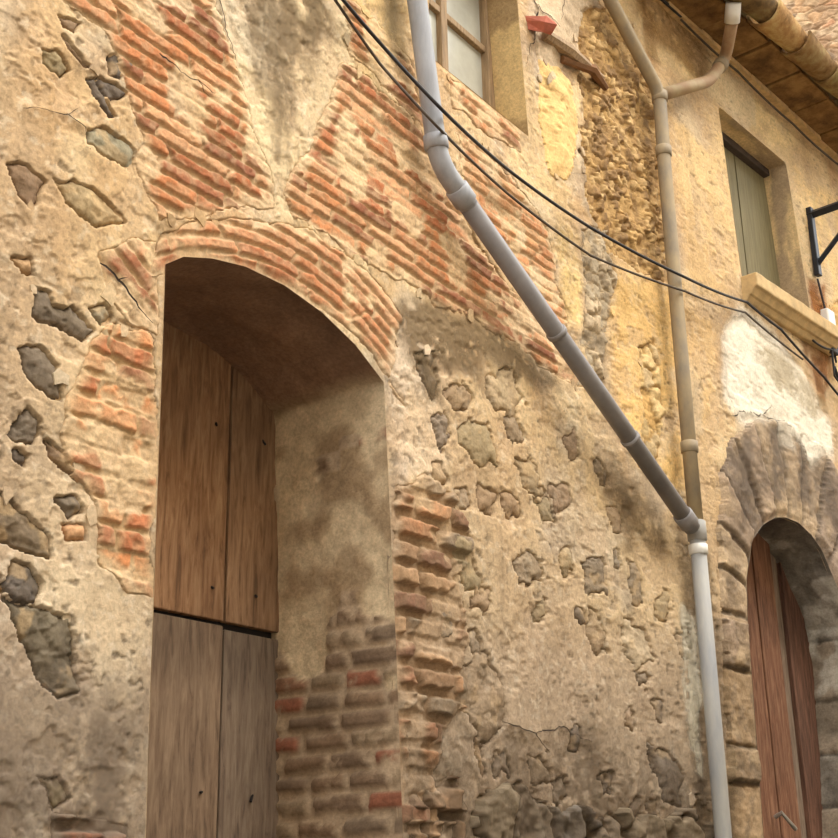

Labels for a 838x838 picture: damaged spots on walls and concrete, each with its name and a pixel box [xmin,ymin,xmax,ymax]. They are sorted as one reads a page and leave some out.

crack [100,263,153,323]
water stain [252,0,323,115]
peeling [0,0,583,598]
spalling [576,0,665,381]
spalling [0,561,79,699]
peeling [390,339,715,838]